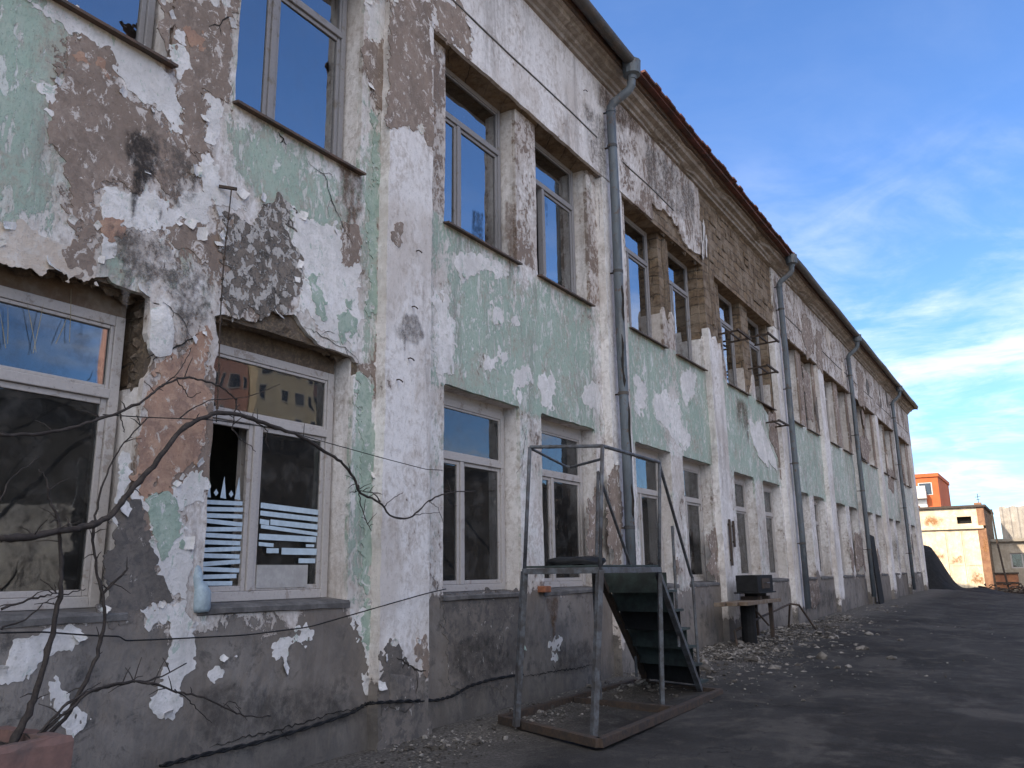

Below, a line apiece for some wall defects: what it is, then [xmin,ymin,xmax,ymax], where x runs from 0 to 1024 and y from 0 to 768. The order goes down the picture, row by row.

peeling [360,0,474,151]
mould [126,132,197,212]
peeling [454,251,510,283]
peeling [489,296,520,326]
peeling [0,0,378,721]
peeling [483,345,559,411]
peeling [633,368,697,451]
peeling [747,409,782,480]
peeling [586,460,625,565]
peeling [42,675,91,738]